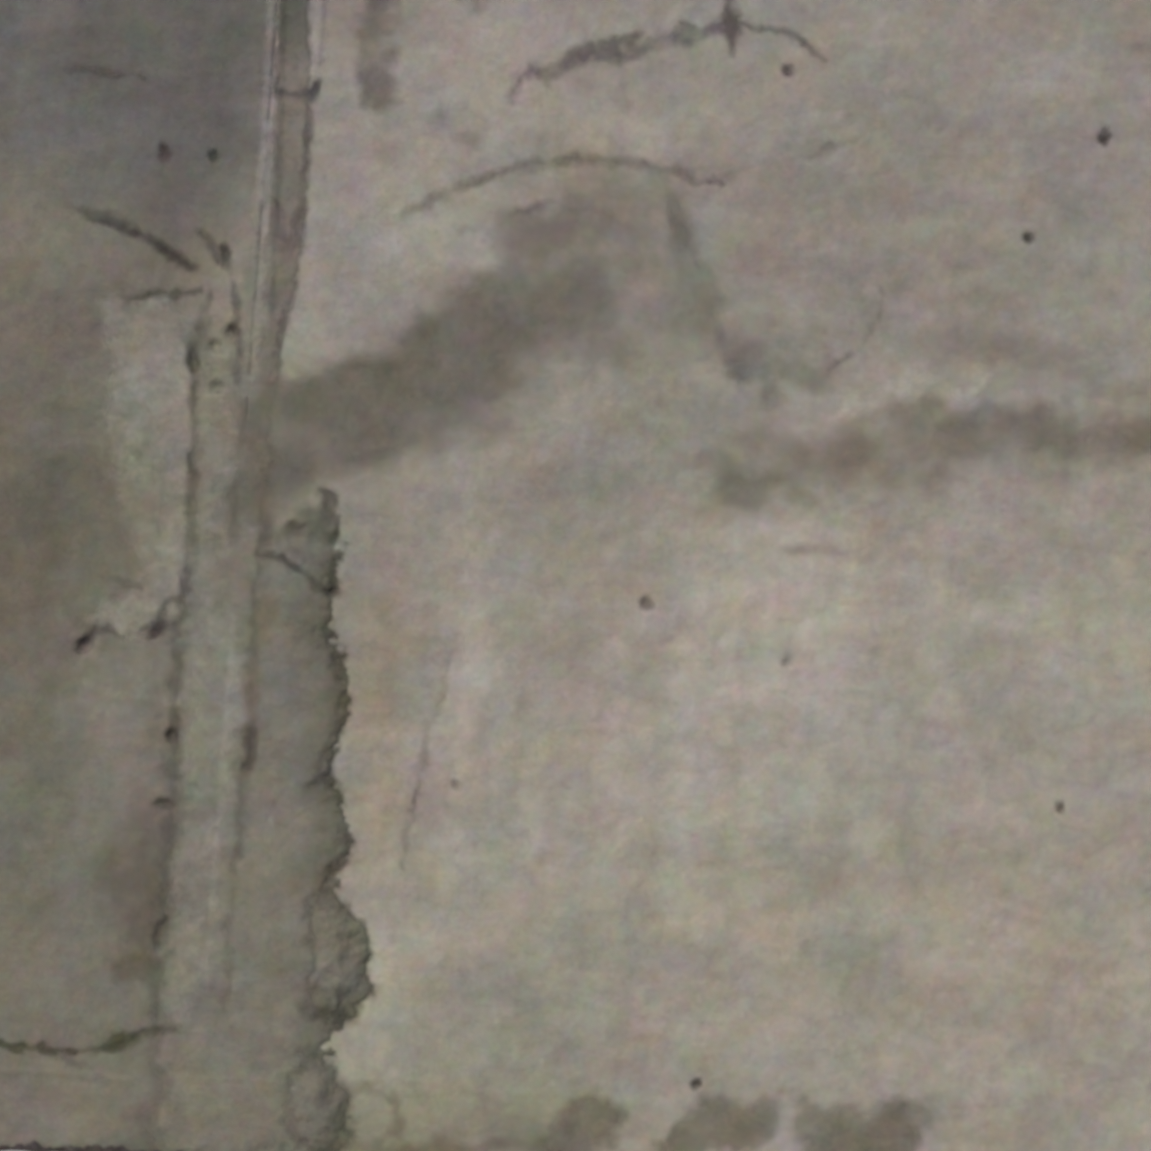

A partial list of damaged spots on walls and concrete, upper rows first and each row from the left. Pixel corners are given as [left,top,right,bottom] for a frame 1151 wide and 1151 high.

leakage [357,0,396,106]
crack [518,32,645,83]
crack [669,5,814,52]
leakage [237,272,610,508]
leakage [904,405,1151,468]
leakage [540,1096,626,1151]
leakage [665,1097,776,1151]
leakage [806,1103,919,1151]